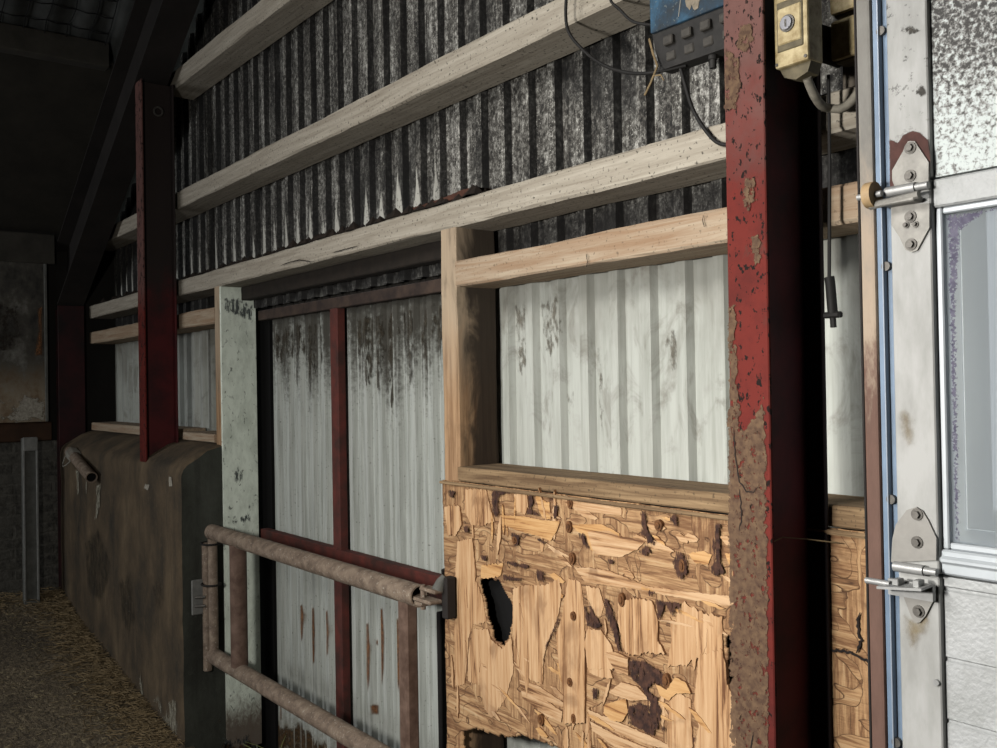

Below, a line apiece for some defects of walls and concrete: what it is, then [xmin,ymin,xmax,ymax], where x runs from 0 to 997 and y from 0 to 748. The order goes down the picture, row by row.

peeling [724,24,754,110]
corrosion [889,131,930,187]
peeling [743,178,757,211]
peeling [751,234,761,265]
water stain [275,324,322,391]
water stain [357,306,442,407]
peeling [444,305,769,748]
corrosion [300,605,329,663]
corrosion [366,609,384,682]